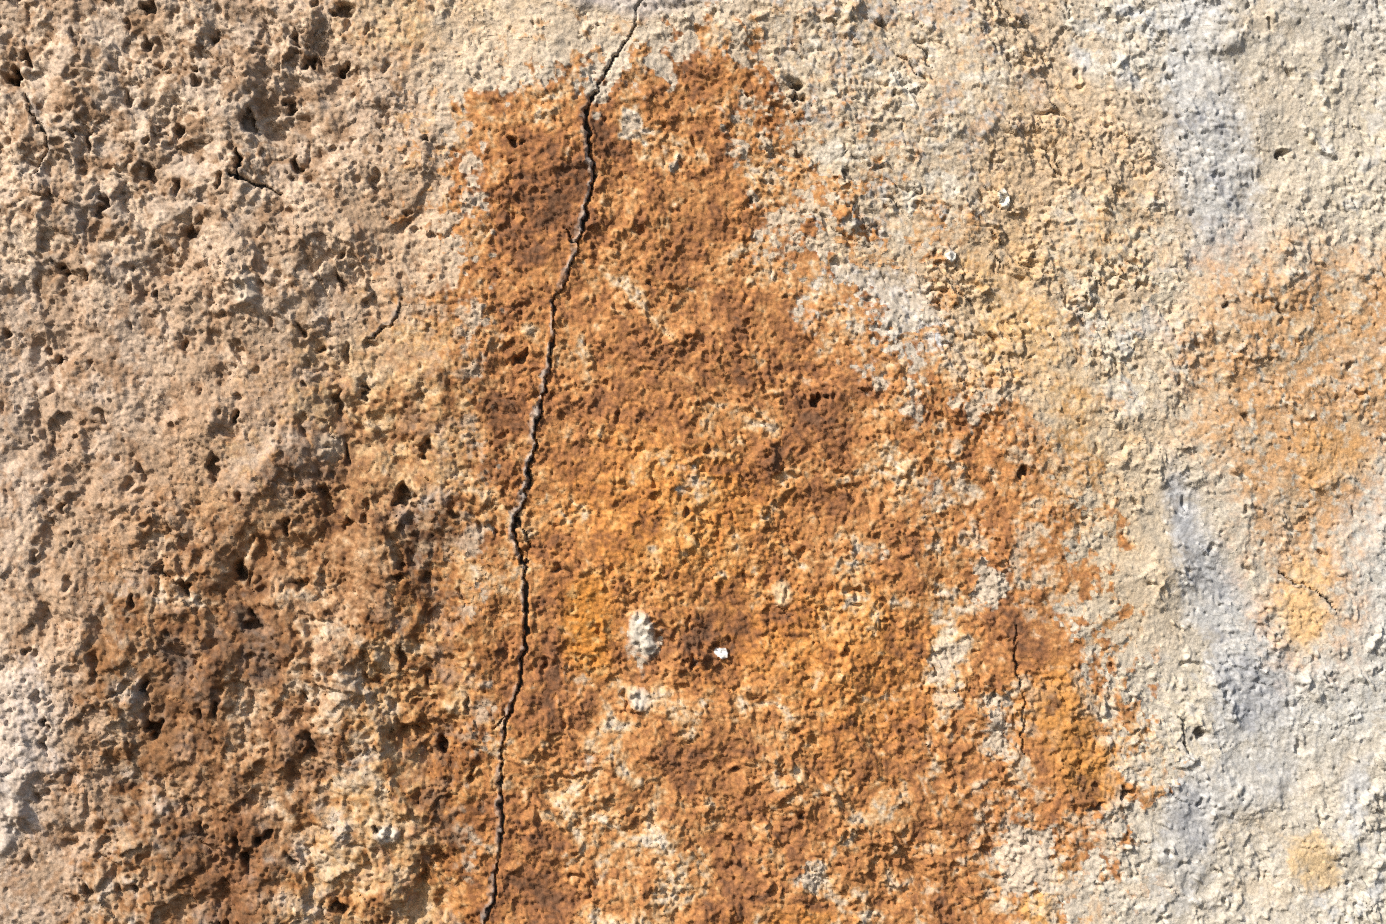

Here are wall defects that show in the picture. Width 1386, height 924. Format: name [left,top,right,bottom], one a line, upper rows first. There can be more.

rust [661,20,685,43]
rust [830,110,877,141]
crack [479,3,638,924]
rust [415,540,428,554]
rust [1141,678,1170,706]
rust [64,890,86,924]